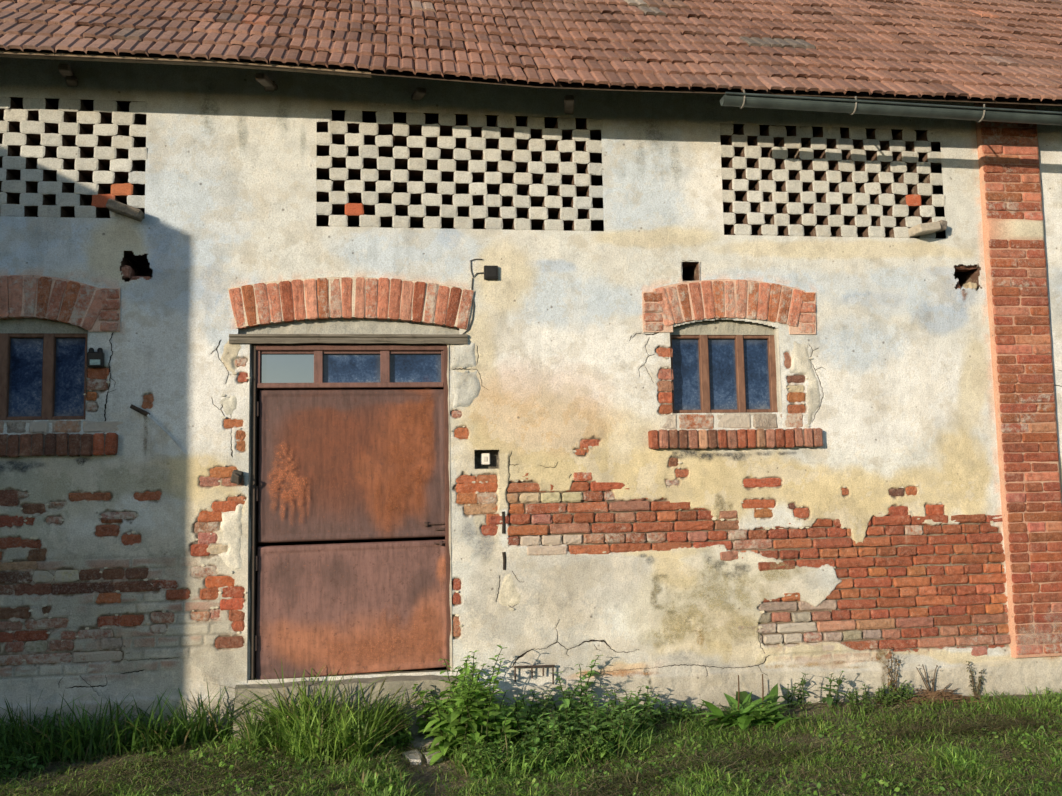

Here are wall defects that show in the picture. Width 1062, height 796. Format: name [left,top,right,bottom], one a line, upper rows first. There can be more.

spalling [120,251,152,282]
spalling [954,264,982,291]
crack [629,332,659,383]
spalling [656,347,674,415]
spalling [223,418,246,451]
spalling [450,409,469,439]
spalling [573,439,600,455]
corrosion [270,444,308,517]
spalling [0,465,247,665]
spalling [456,448,1011,659]
spalling [451,579,463,637]
crack [510,613,770,676]